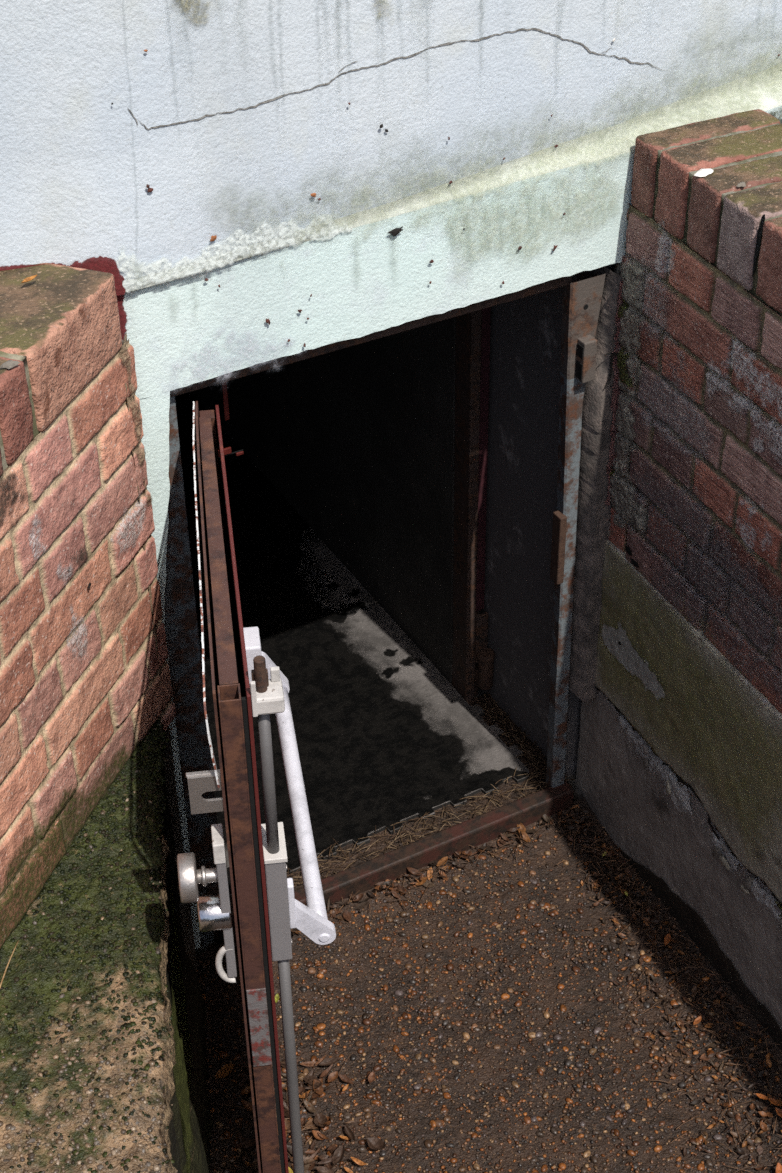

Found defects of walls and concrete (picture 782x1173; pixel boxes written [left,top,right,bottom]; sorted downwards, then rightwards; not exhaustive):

crack [128,28,662,130]
water stain [628,476,782,694]
crack [595,687,782,905]